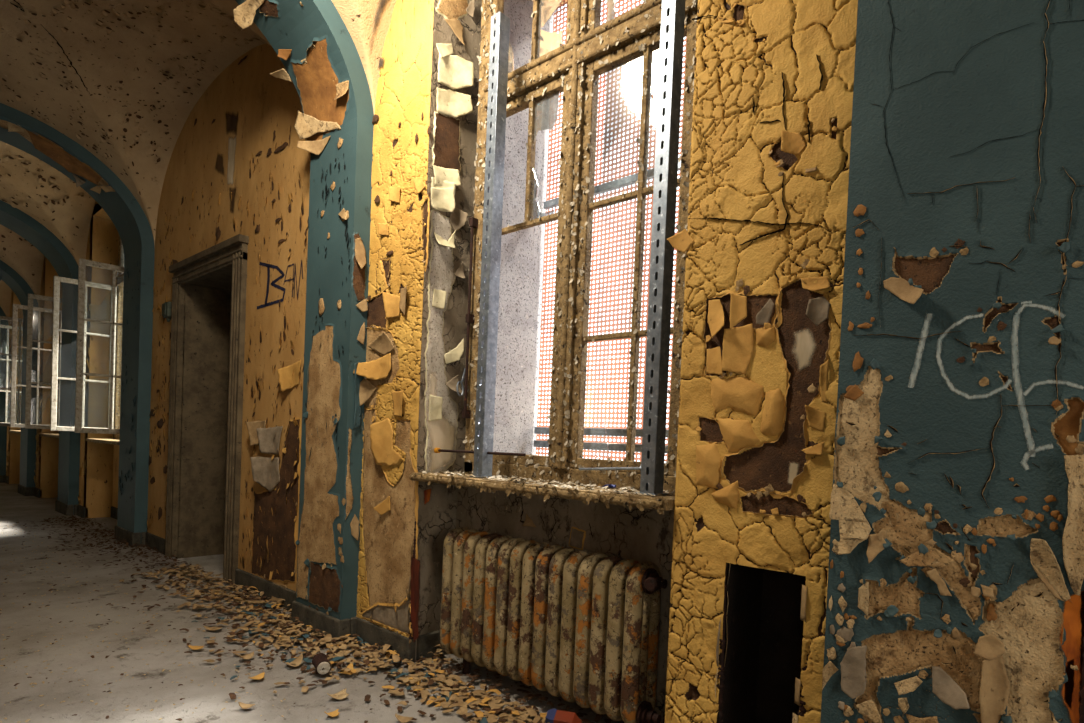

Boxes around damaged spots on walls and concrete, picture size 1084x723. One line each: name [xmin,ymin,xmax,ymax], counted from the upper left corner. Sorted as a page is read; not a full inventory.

crack [10,0,90,94]
peeling [0,0,280,221]
crack [751,72,810,142]
crack [688,174,974,349]
peeling [853,204,871,299]
peeling [883,238,969,304]
crack [870,0,1084,550]
peeling [956,300,1016,363]
peeling [696,259,834,520]
peeling [822,351,1084,723]
crack [920,593,968,673]
crack [992,564,1043,611]